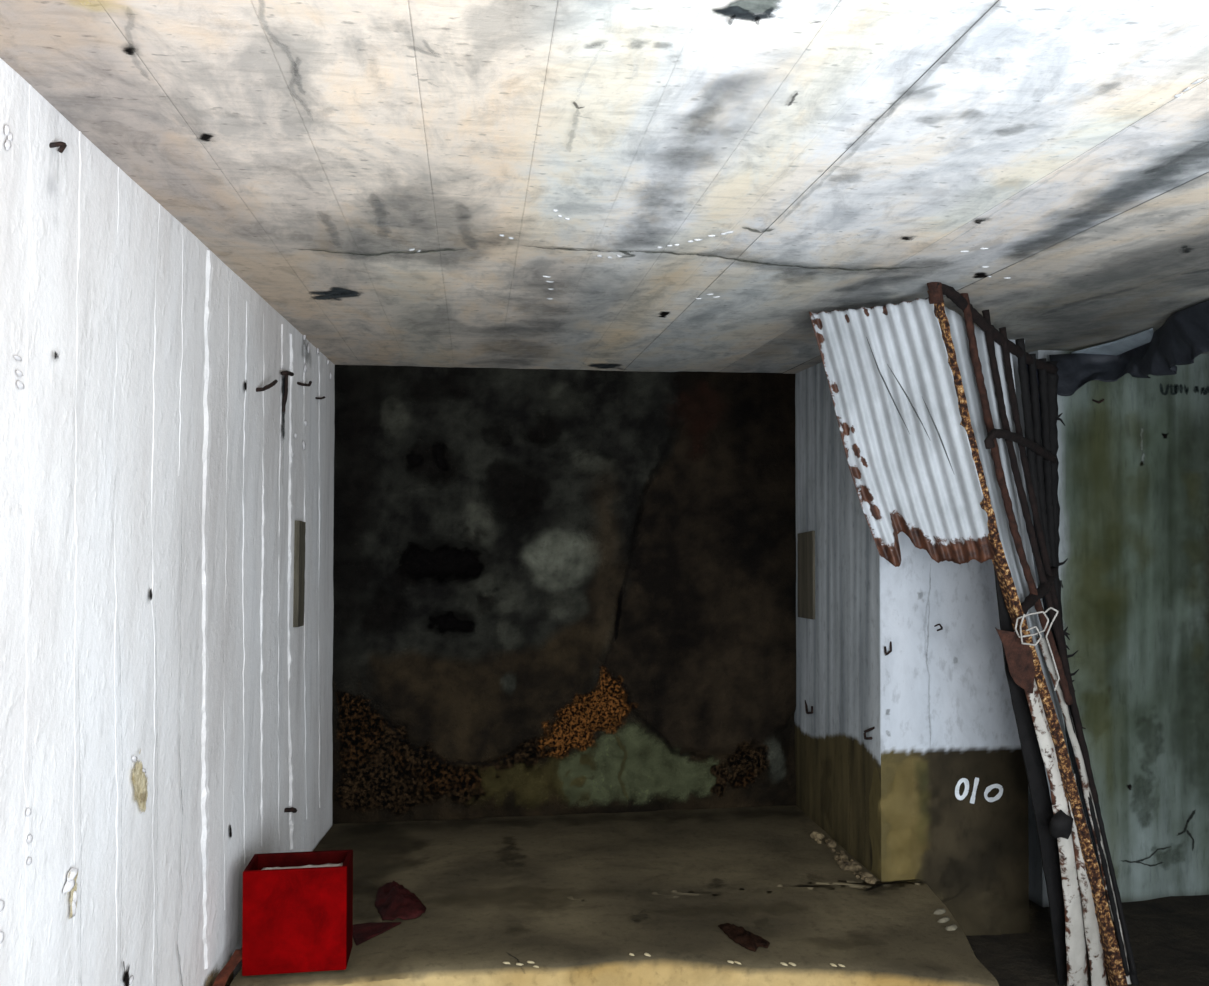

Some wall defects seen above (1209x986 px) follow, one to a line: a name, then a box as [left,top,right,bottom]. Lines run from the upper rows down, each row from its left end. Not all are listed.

crack [614,587,622,641]
spalling [132,750,148,812]
spalling [123,961,134,986]
peeling [205,955,234,986]